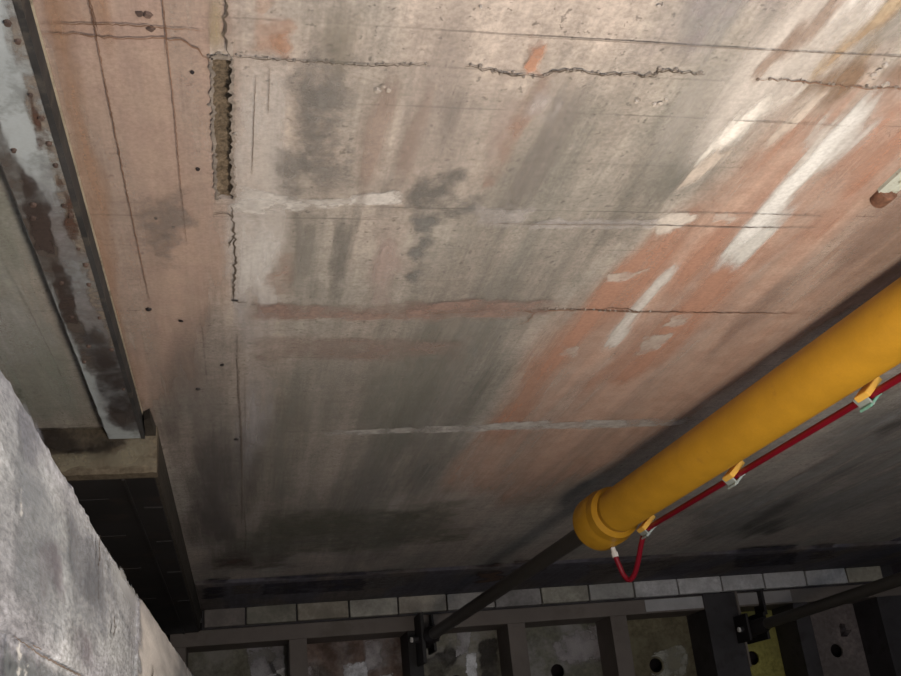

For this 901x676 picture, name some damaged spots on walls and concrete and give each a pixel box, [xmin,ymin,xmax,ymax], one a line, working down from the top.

rust [0,142,118,378]
rust [33,0,225,430]
spalling [207,52,238,201]
crack [41,0,429,303]
water stain [232,172,465,307]
water stain [606,267,674,347]
efflorescence [642,213,696,234]
rust [464,122,901,500]
crack [465,36,901,79]
efflorescence [721,99,876,264]